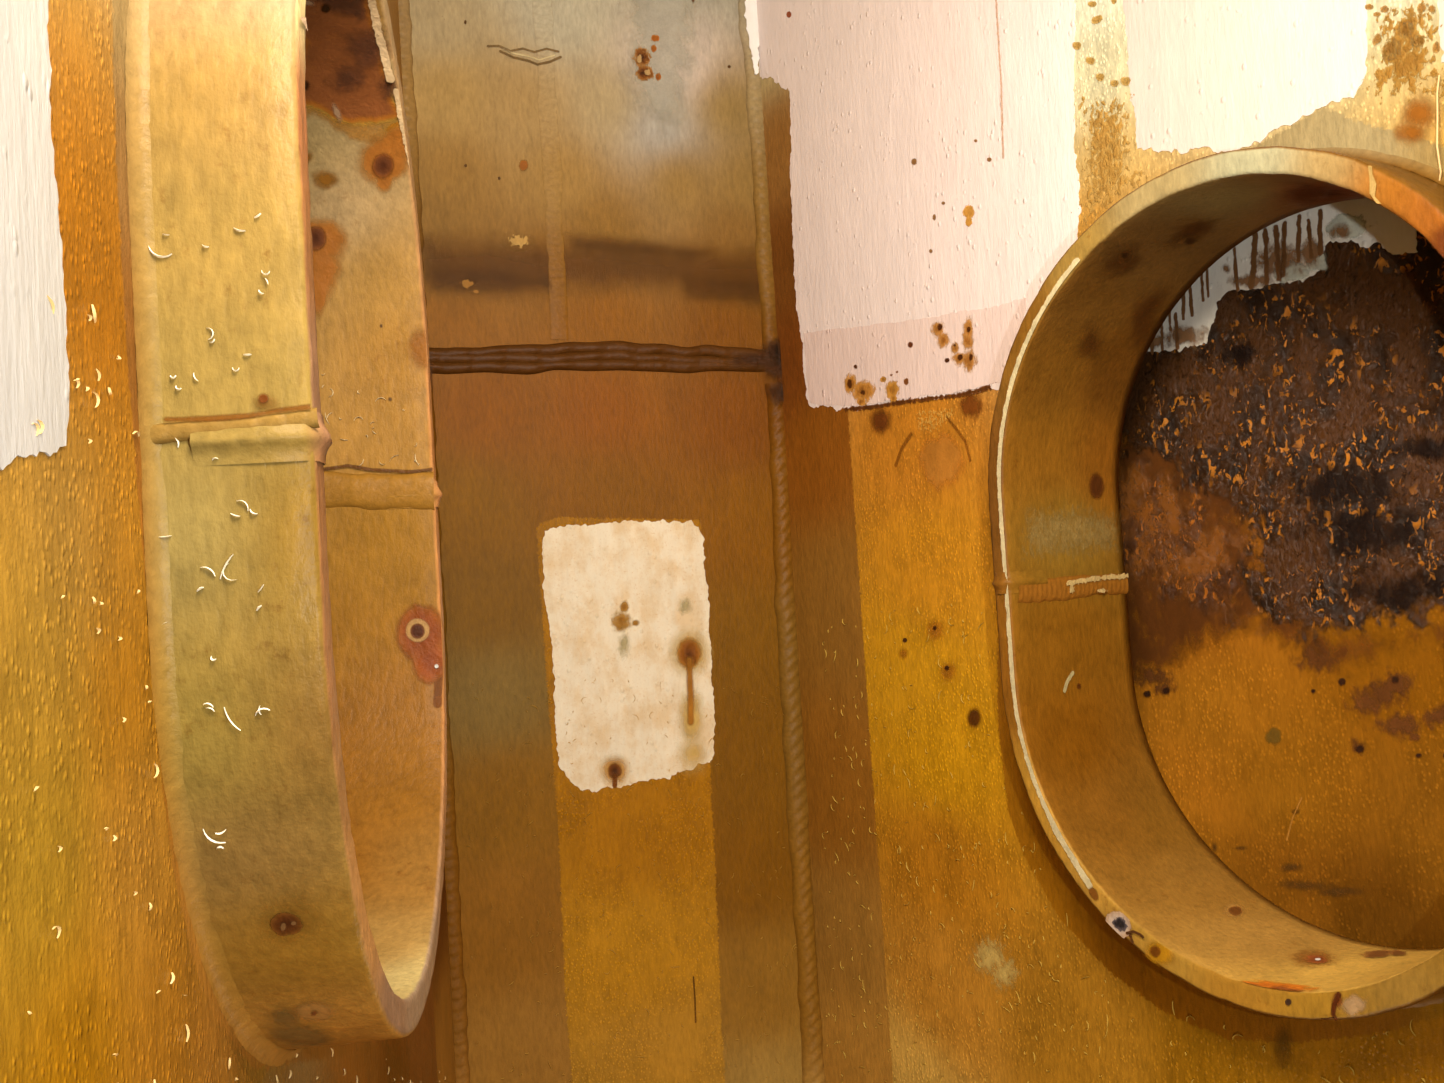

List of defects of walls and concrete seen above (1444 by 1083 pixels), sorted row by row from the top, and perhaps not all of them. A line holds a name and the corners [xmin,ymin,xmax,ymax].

corrosion [305,0,408,191]
corrosion [1397,102,1432,140]
peeling [1368,166,1381,204]
corrosion [310,221,346,314]
corrosion [844,365,992,412]
corrosion [931,319,977,372]
corrosion [1119,433,1444,757]
corrosion [397,605,443,708]
corrosion [677,636,703,760]